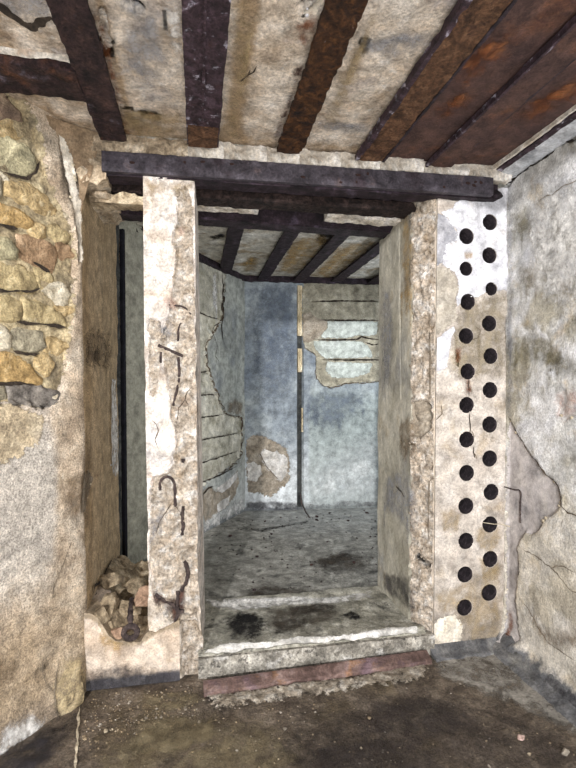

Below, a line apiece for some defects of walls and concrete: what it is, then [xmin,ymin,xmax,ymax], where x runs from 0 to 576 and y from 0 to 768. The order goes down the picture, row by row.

spalling [0,93,83,465]
crack [212,274,225,363]
spalling [147,185,508,675]
corrosion [153,591,184,619]
leakage [223,605,361,641]
peeling [496,421,561,644]
crack [520,547,576,593]